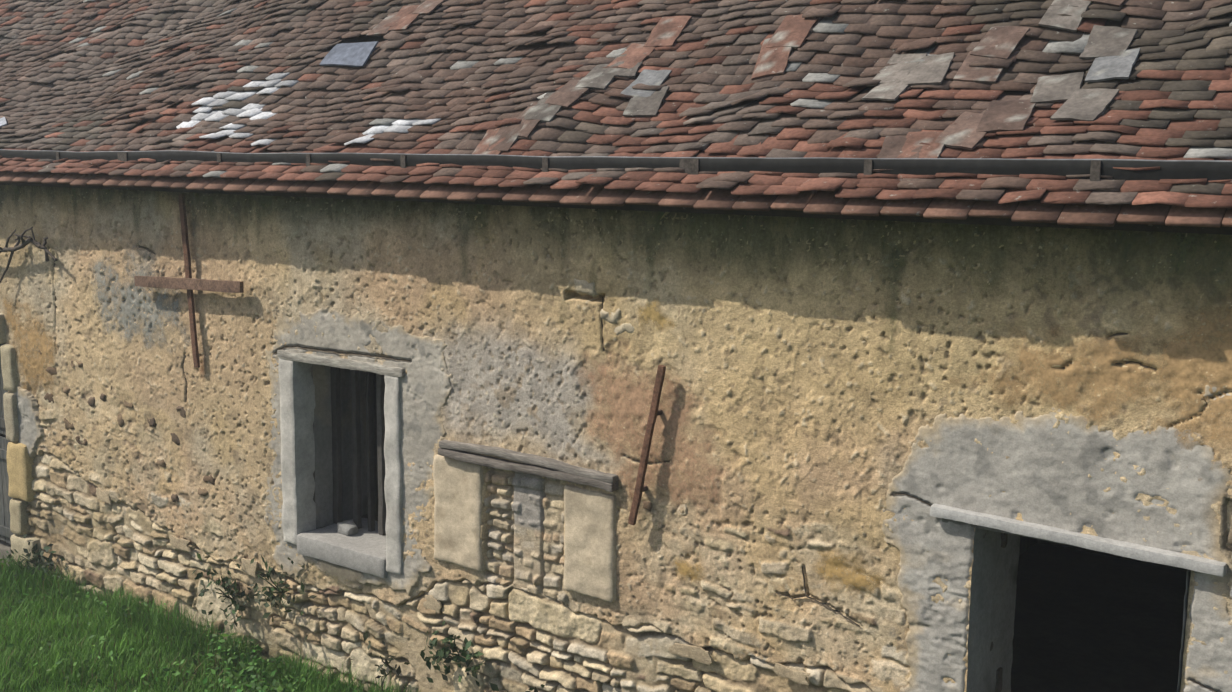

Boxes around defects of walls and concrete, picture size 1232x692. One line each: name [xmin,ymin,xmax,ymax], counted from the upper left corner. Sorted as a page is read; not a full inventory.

damp [95,254,186,347]
damp [997,300,1232,442]
peeling [241,558,258,577]
crack [776,566,860,627]
peeling [669,643,713,665]
peeling [774,663,810,685]